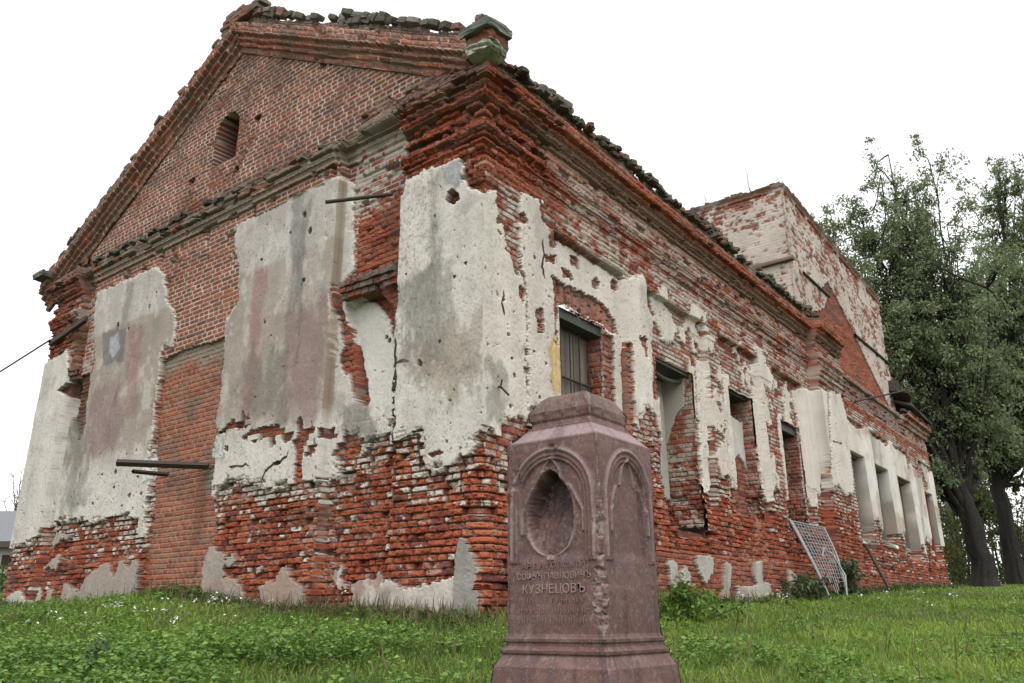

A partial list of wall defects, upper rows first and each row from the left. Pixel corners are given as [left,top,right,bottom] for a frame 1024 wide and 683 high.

crack [539,240,547,278]
peeling [1,267,177,605]
crack [229,452,288,484]
crack [391,338,422,467]
spalling [200,158,951,620]